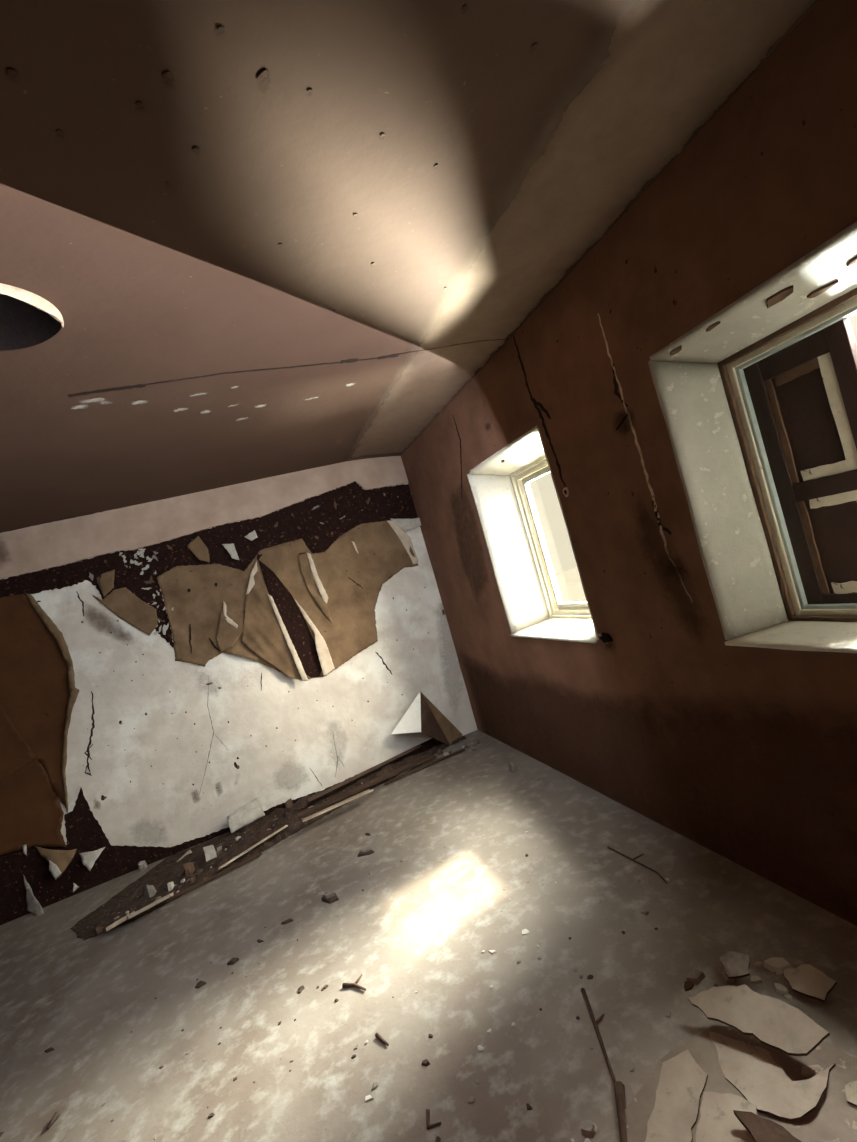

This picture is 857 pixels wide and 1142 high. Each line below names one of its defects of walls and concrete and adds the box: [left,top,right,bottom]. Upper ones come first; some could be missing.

crack [68,335,566,493]
crack [598,313,693,603]
flaking render [0,482,421,647]
flaking render [0,788,230,925]
flaking render [263,774,357,817]
peeling [322,893,339,904]
peeling [358,833,375,857]
flaking render [398,738,443,762]